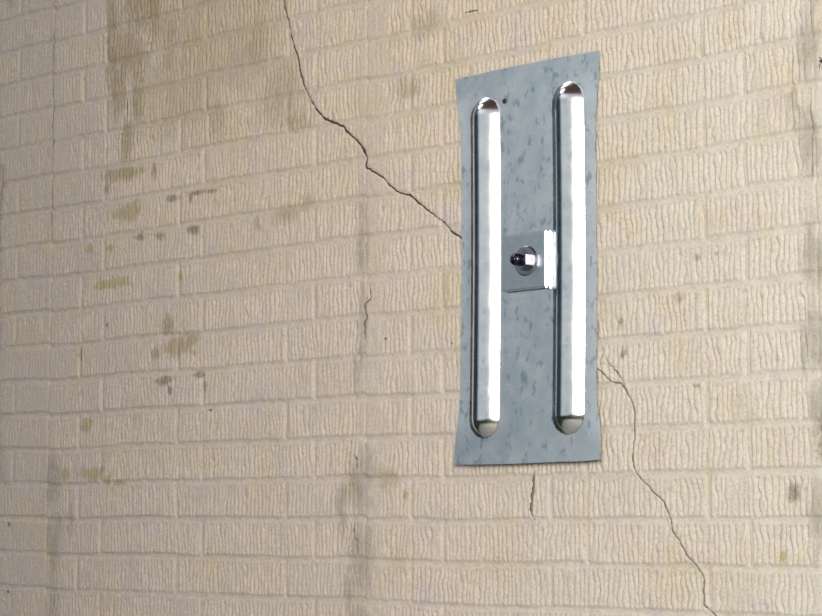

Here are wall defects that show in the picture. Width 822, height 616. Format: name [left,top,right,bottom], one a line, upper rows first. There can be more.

crack [284,0,462,239]
crack [363,286,371,340]
crack [528,470,536,520]
crack [597,358,717,616]